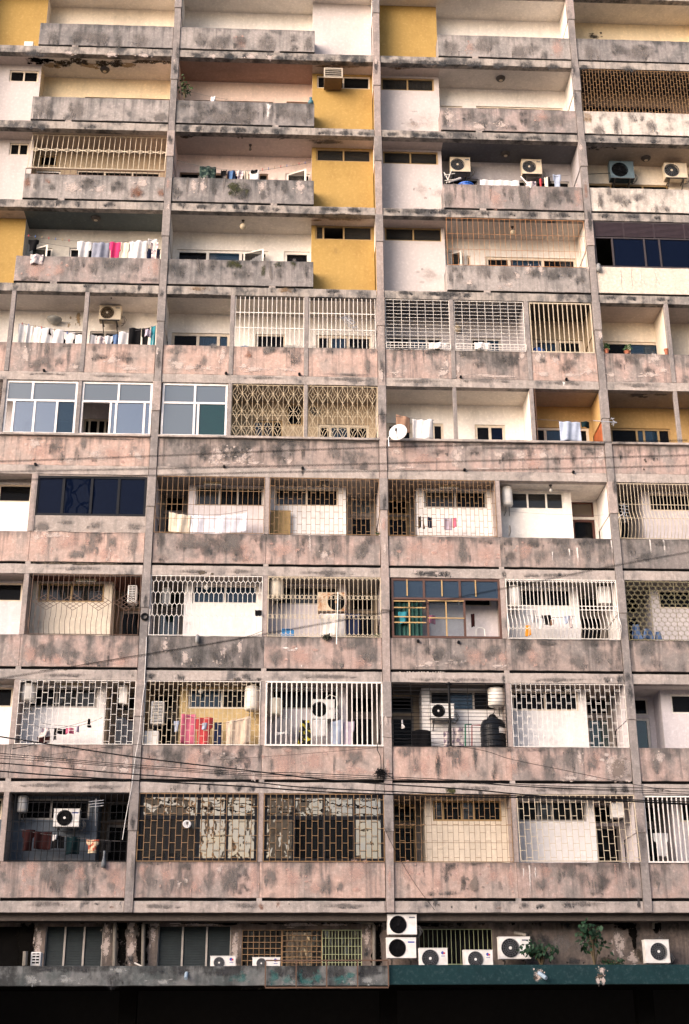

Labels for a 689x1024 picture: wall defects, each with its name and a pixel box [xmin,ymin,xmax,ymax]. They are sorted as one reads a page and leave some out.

spalling [27,51,175,69]
water stain [585,114,658,150]
water stain [172,176,249,210]
water stain [415,183,532,217]
water stain [180,535,247,573]
water stain [297,536,340,558]
water stain [525,540,612,577]
water stain [543,749,575,774]
water stain [204,869,253,908]
water stain [264,869,276,886]
water stain [321,876,356,909]
spalling [101,923,241,972]